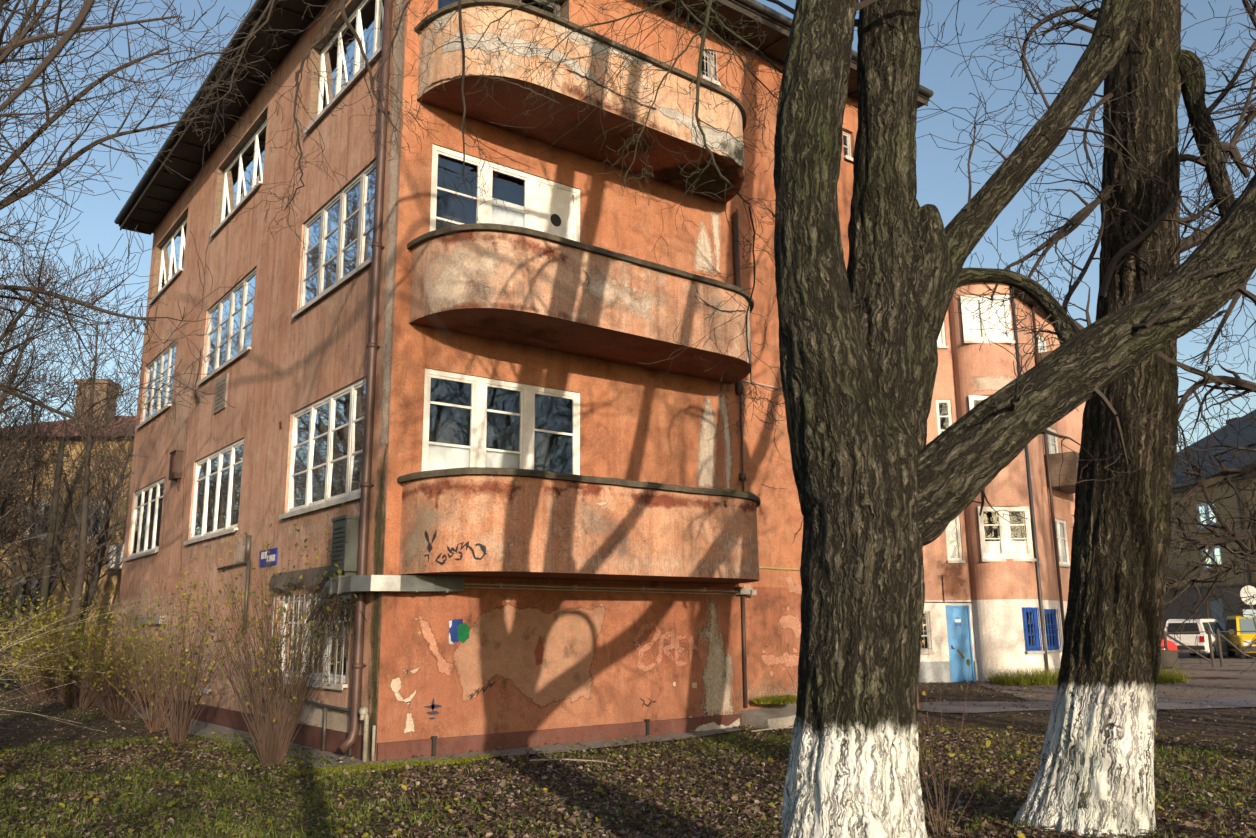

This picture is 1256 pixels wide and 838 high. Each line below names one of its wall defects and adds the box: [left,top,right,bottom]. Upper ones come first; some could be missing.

flaking render [434,9,653,81]
spalling [659,107,745,169]
peeling [414,597,606,708]
flaking render [390,667,420,733]